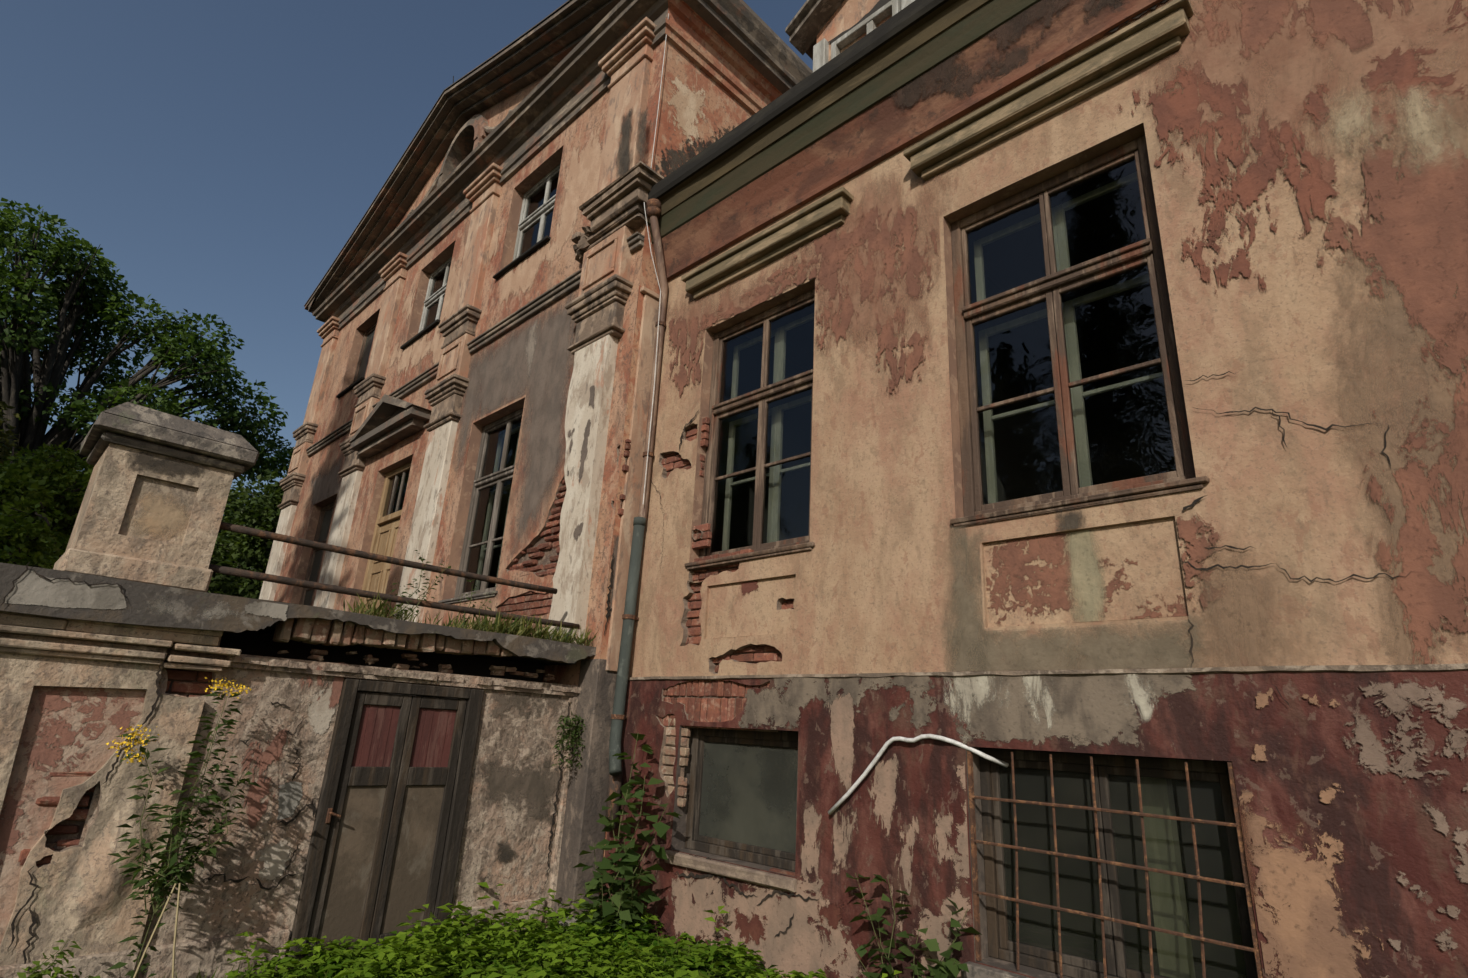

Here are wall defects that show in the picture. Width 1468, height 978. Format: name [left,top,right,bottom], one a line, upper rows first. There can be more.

crack [1184,371,1391,469]
flaking render [497,386,595,616]
crack [1183,495,1207,510]
crack [1180,545,1413,582]
peeling [0,686,145,867]
crack [99,667,162,788]
flaking render [165,663,212,697]
spalling [219,601,554,735]
peeling [658,645,1197,978]
crack [1187,619,1195,668]
crack [8,866,39,964]
peeling [1239,791,1401,978]